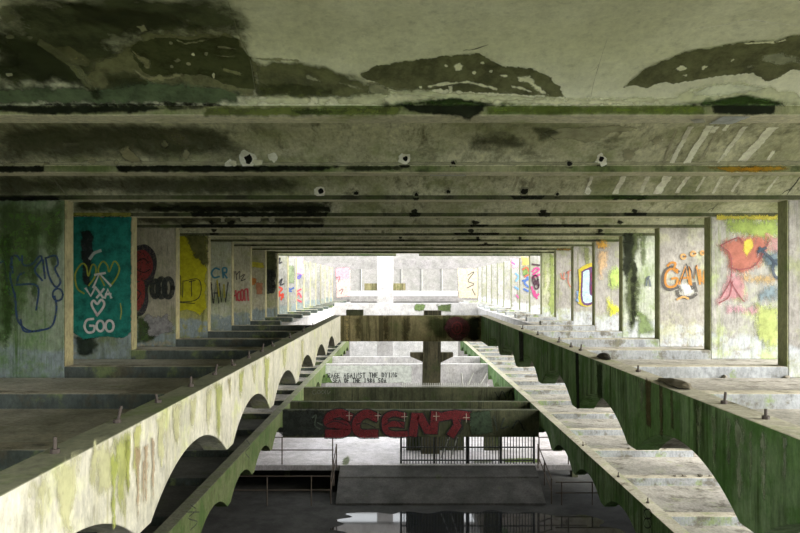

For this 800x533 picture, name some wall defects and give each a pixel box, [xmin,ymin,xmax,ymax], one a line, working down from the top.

peeling [130,36,256,89]
damp [0,0,800,120]
peeling [360,53,566,98]
peeling [623,35,800,88]
spalling [225,150,278,170]
spalling [398,153,411,168]
spalling [595,153,607,167]
damp [604,176,691,334]
damp [75,337,97,355]